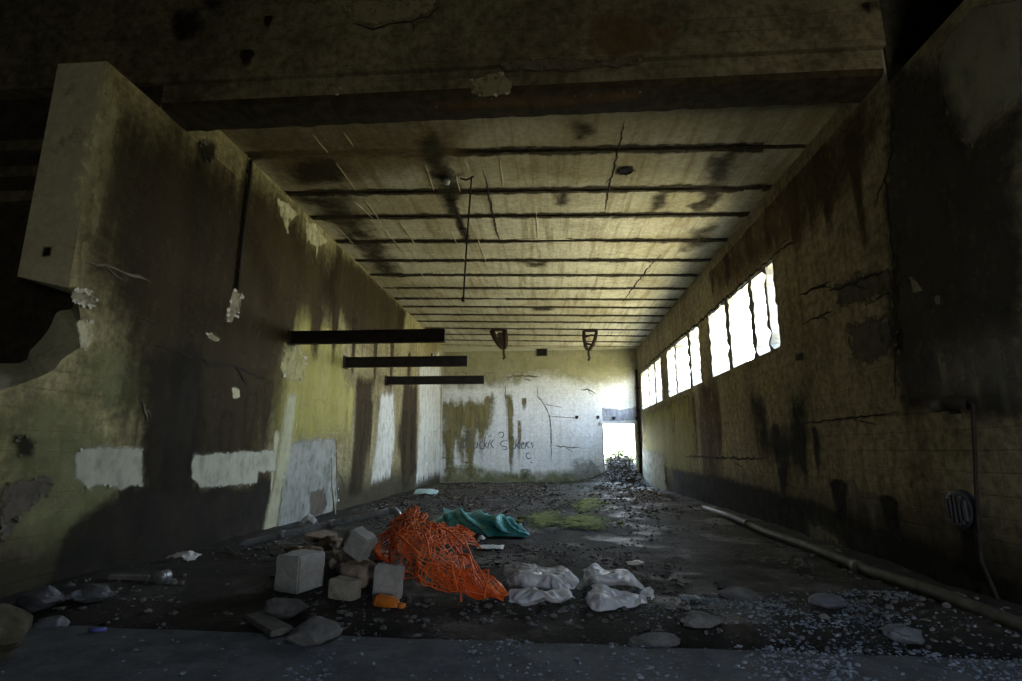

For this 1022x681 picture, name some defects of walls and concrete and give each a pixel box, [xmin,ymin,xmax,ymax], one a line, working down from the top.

spalling [469,71,512,97]
crack [605,121,625,209]
peeling [71,286,99,324]
peeling [225,288,244,322]
crack [623,255,661,301]
crack [800,79,896,424]
damp [52,108,876,582]
spalling [15,434,36,458]
crack [503,375,582,455]
crack [684,455,767,467]
spalling [0,475,54,542]
damp [672,397,1020,604]